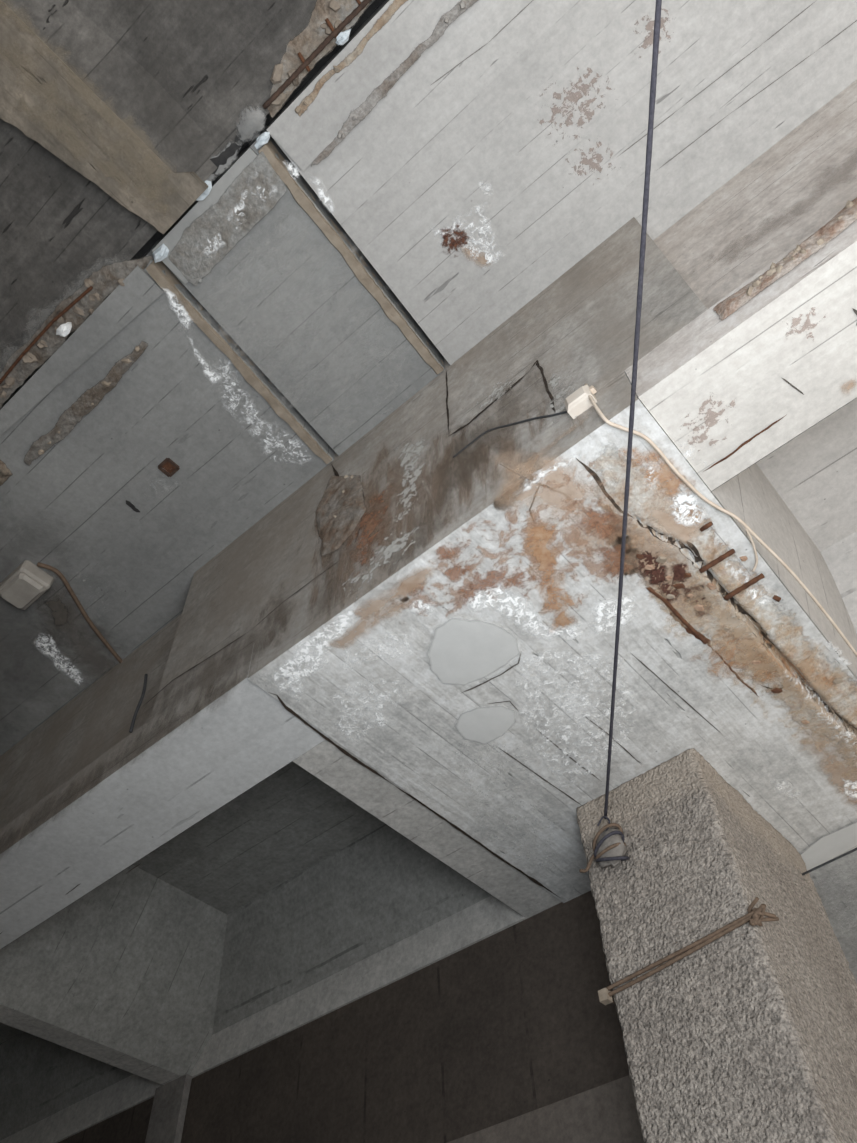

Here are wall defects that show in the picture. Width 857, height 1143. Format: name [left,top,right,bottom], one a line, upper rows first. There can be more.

spalling [262,0,408,118]
spalling [311,0,478,166]
spalling [0,256,154,409]
spalling [169,152,287,286]
leakage [164,289,305,461]
leakage [436,207,500,263]
crack [446,360,555,436]
spalling [713,198,857,320]
leakage [36,635,83,684]
leakage [274,437,429,697]
rust [322,441,713,646]
spalling [589,445,857,768]